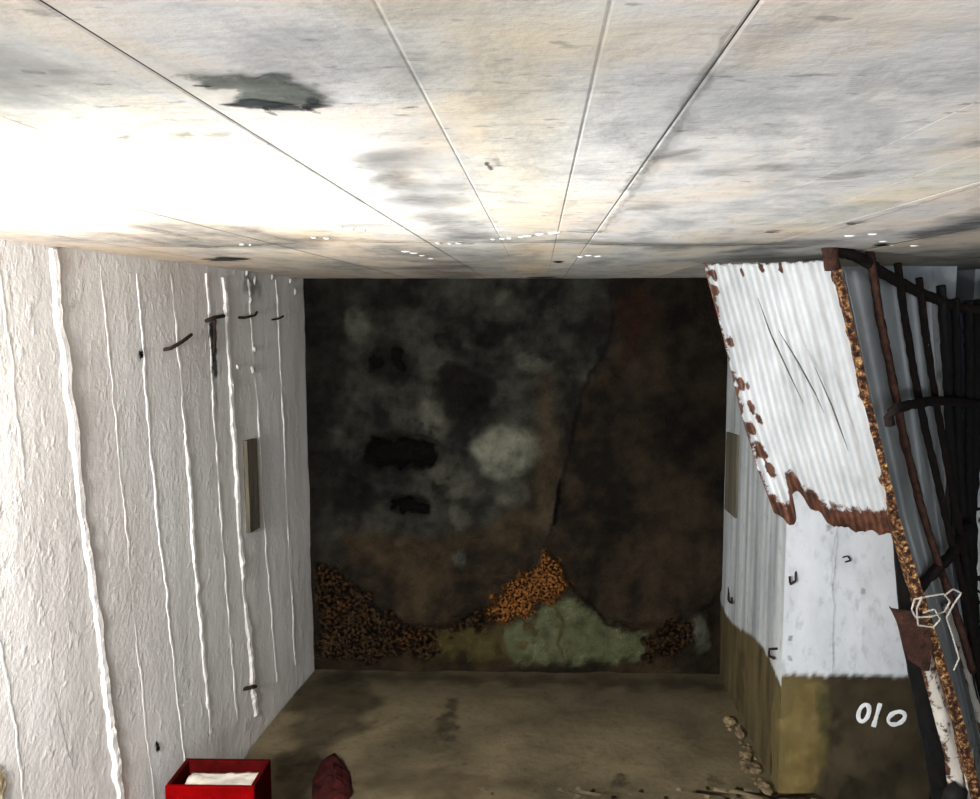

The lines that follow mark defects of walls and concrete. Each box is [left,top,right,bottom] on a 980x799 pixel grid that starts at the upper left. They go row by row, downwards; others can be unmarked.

crack [552,479,560,526]